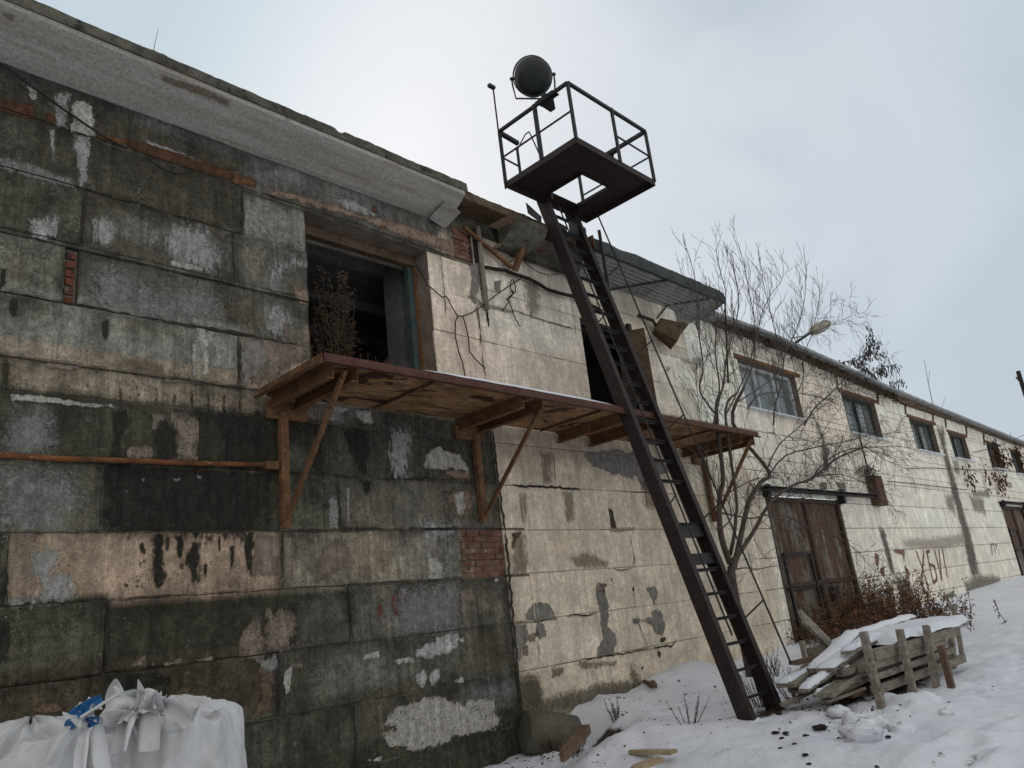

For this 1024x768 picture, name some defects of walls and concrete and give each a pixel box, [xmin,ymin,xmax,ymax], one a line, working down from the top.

rust [96,135,257,189]
peeling [264,188,456,253]
peeling [423,446,473,519]
leakage [165,534,208,583]
leakage [218,533,255,576]
crack [493,430,595,716]
crack [584,534,677,660]
peeling [129,655,213,667]
peeling [238,607,303,723]
peeling [368,585,501,762]